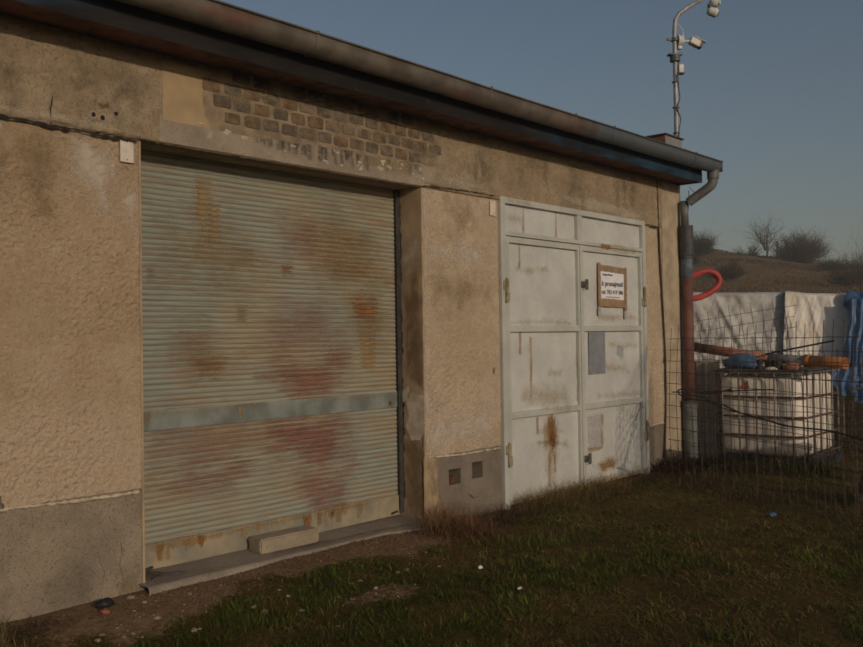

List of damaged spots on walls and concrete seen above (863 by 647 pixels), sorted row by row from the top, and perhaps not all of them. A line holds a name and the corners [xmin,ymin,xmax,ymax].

crack [0,94,141,143]
flaking render [198,69,441,181]
corrosion [537,416,556,471]